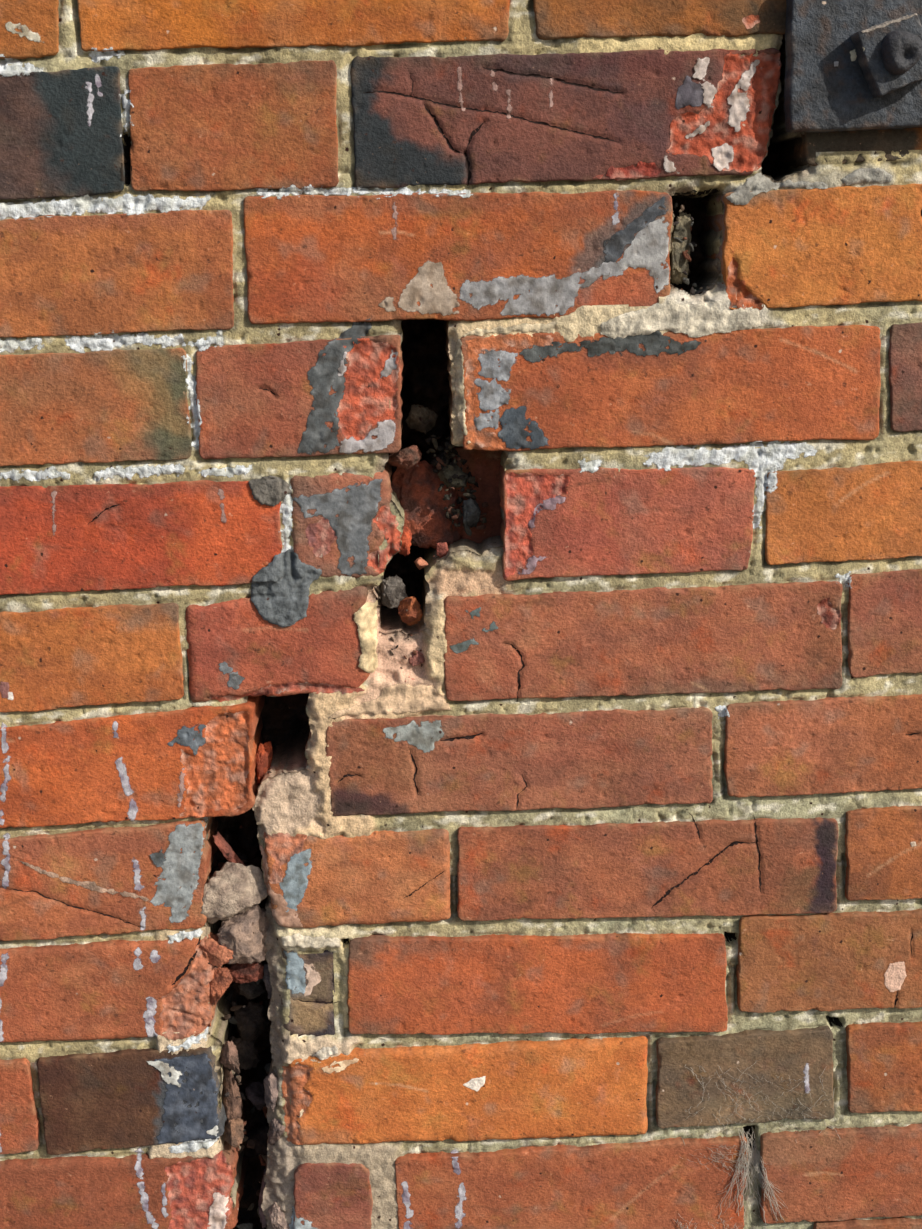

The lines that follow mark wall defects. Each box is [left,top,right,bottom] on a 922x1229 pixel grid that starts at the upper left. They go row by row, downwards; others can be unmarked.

spalling [593,52,780,181]
peeling [379,197,670,316]
crack [388,319,451,478]
peeling [464,330,707,450]
crack [381,544,425,608]
crack [260,693,310,749]
water stain [0,722,11,888]
spalling [150,662,365,928]
water stain [133,928,203,970]
water stain [143,997,209,1053]
crack [172,936,339,1229]
water stain [134,1147,168,1229]